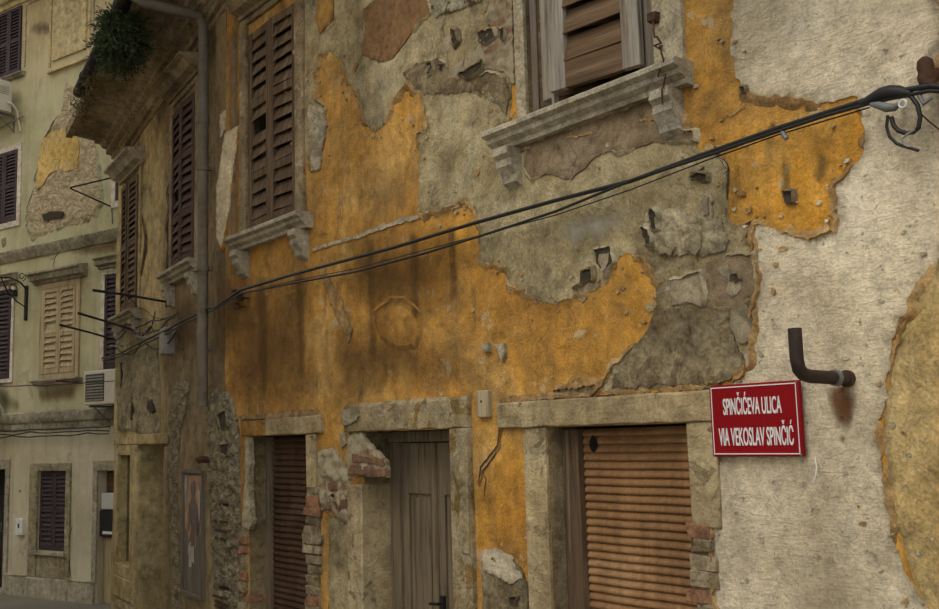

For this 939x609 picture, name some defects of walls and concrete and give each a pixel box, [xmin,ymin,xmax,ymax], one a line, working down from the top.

flaking render [25,81,104,242]
flaking render [290,0,939,609]
flaking render [115,343,161,435]
corrosion [830,387,852,423]